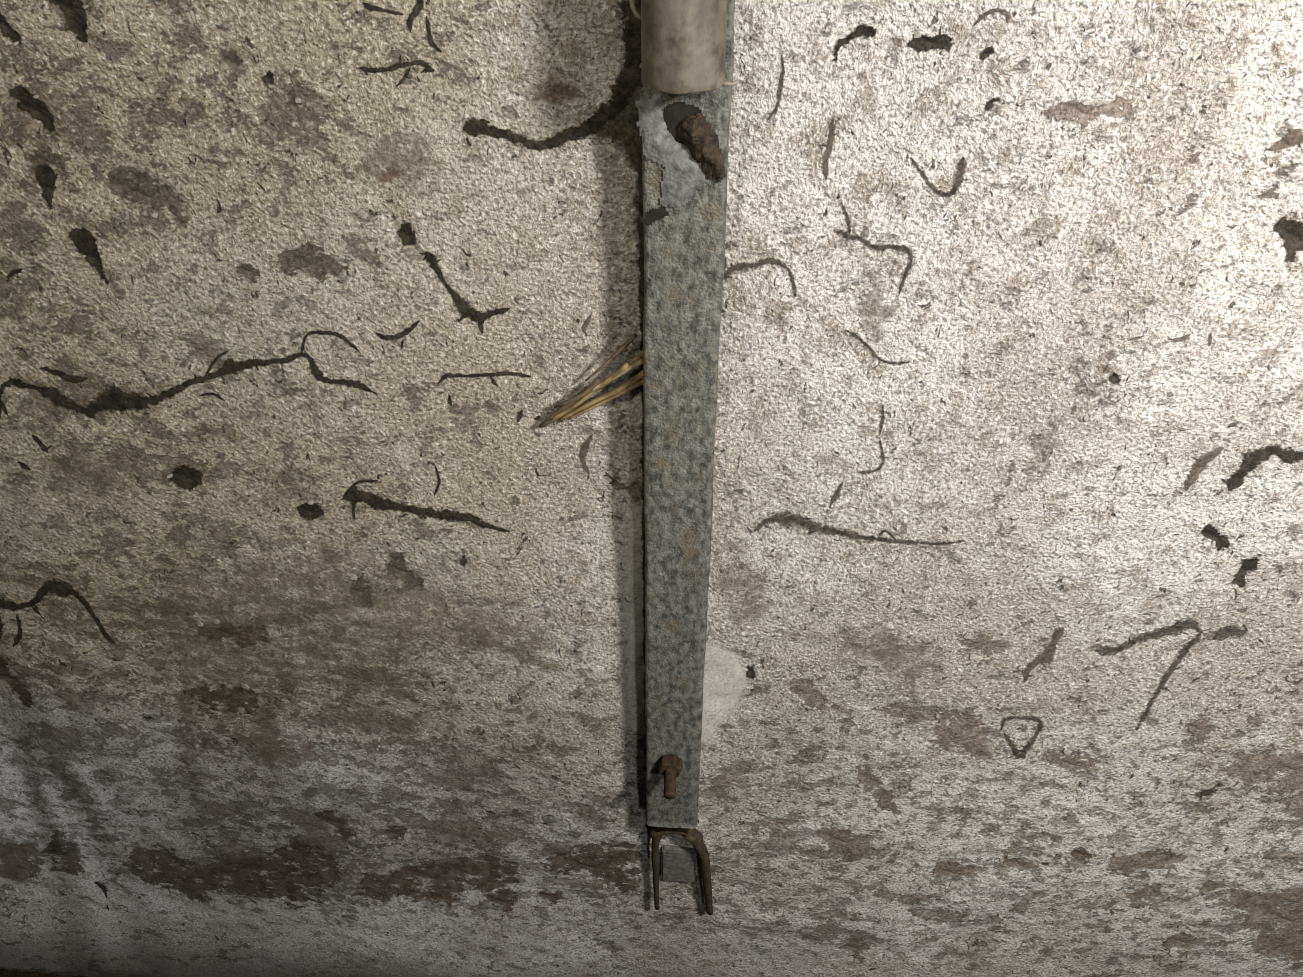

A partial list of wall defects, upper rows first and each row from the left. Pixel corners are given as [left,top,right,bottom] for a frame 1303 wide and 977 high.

crack [6,269,22,282]
crack [420,251,510,334]
crack [0,320,420,470]
crack [463,0,654,835]
crack [341,464,510,532]
crack [754,405,965,545]
crack [1184,446,1303,491]
crack [0,578,115,647]
water stain [161,556,541,690]
crack [1024,627,1064,682]
crack [1095,618,1248,730]
crack [1001,716,1043,758]